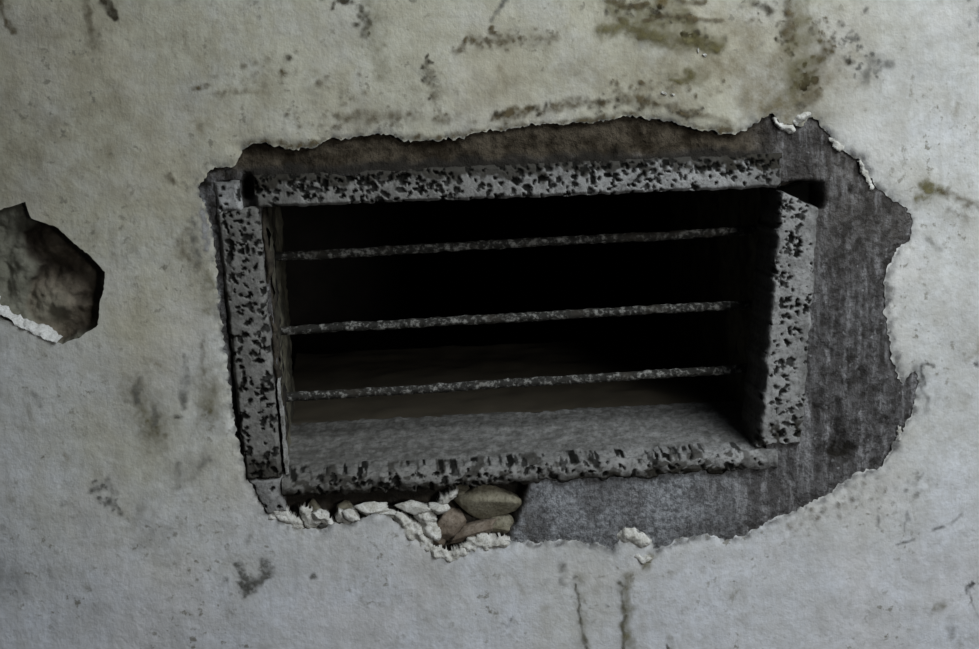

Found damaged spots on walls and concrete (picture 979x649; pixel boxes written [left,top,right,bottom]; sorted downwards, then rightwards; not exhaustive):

leakage [491,102,580,124]
leakage [599,94,704,118]
spalling [0,202,105,344]
spalling [198,112,921,564]